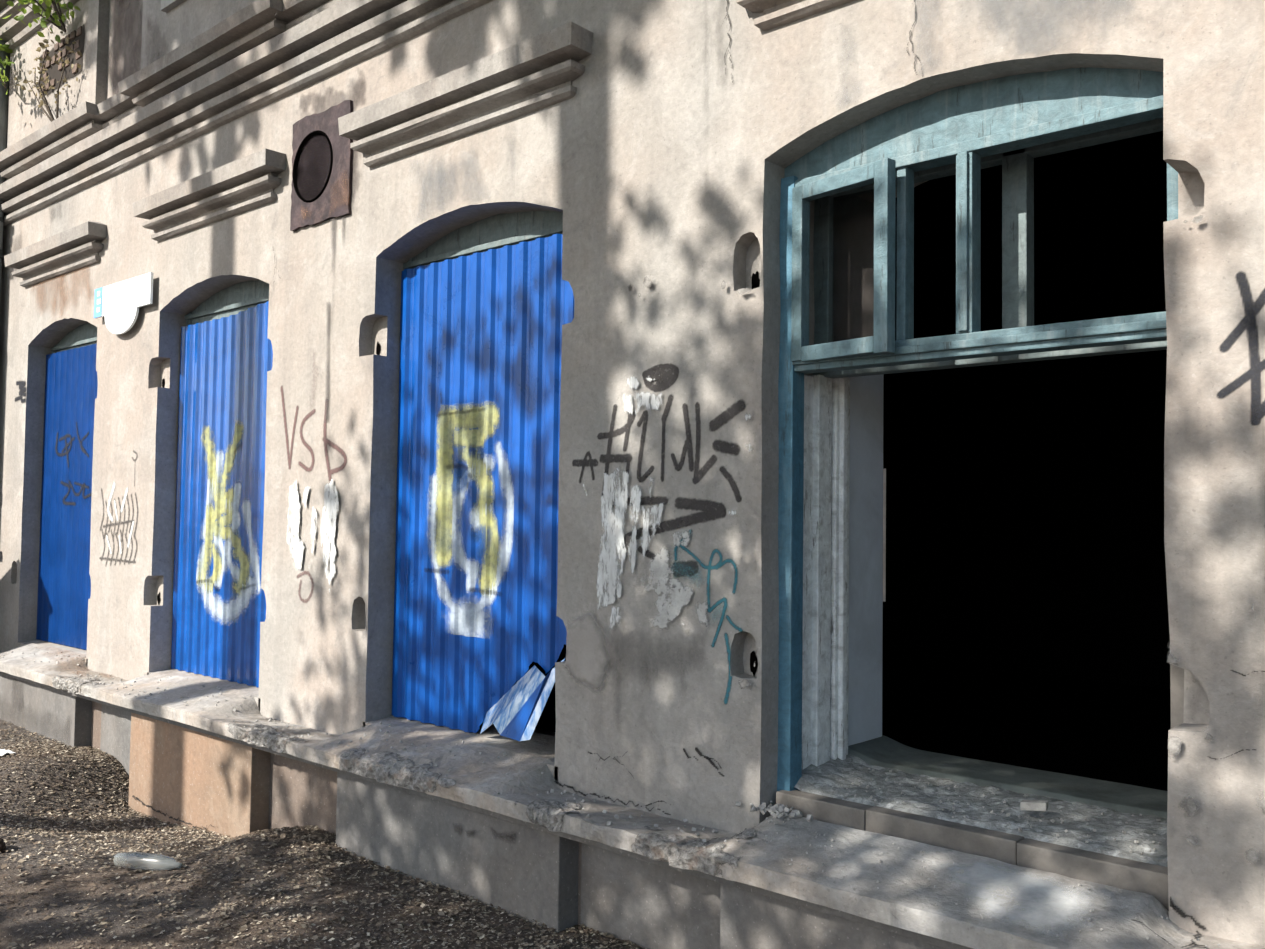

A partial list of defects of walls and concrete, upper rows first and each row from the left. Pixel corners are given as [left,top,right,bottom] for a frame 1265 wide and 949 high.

crack [724,0,733,82]
crack [907,0,923,77]
peeling [642,531,708,629]
spalling [339,748,456,793]
spalling [1168,736,1181,757]
spalling [515,800,582,831]
spalling [631,826,756,875]
crack [1133,897,1208,949]